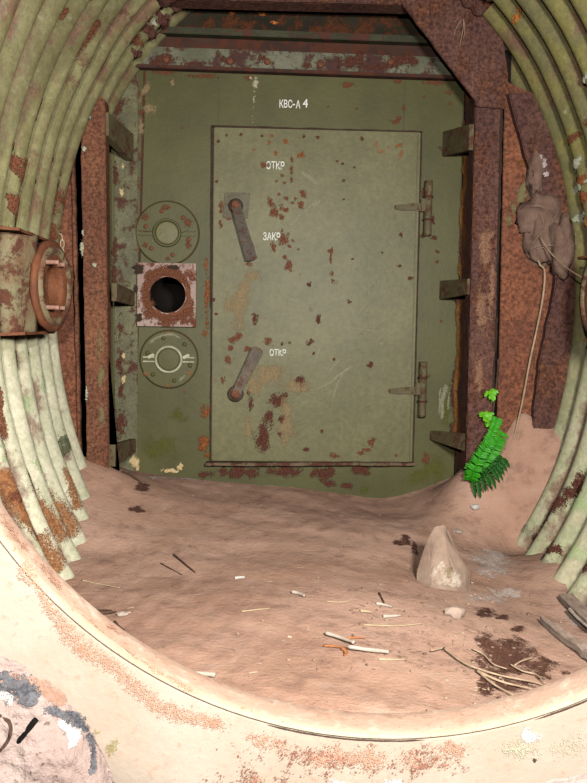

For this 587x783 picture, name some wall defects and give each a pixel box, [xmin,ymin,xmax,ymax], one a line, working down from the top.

rust [129,7,220,79]
rust [301,51,419,71]
rust [266,190,307,272]
rust [458,153,468,279]
rust [139,255,195,336]
rust [475,216,497,345]
rust [115,311,126,399]
rust [450,297,462,432]
rust [473,353,484,392]
rust [530,470,587,545]
rust [0,386,481,783]
rust [541,540,563,559]